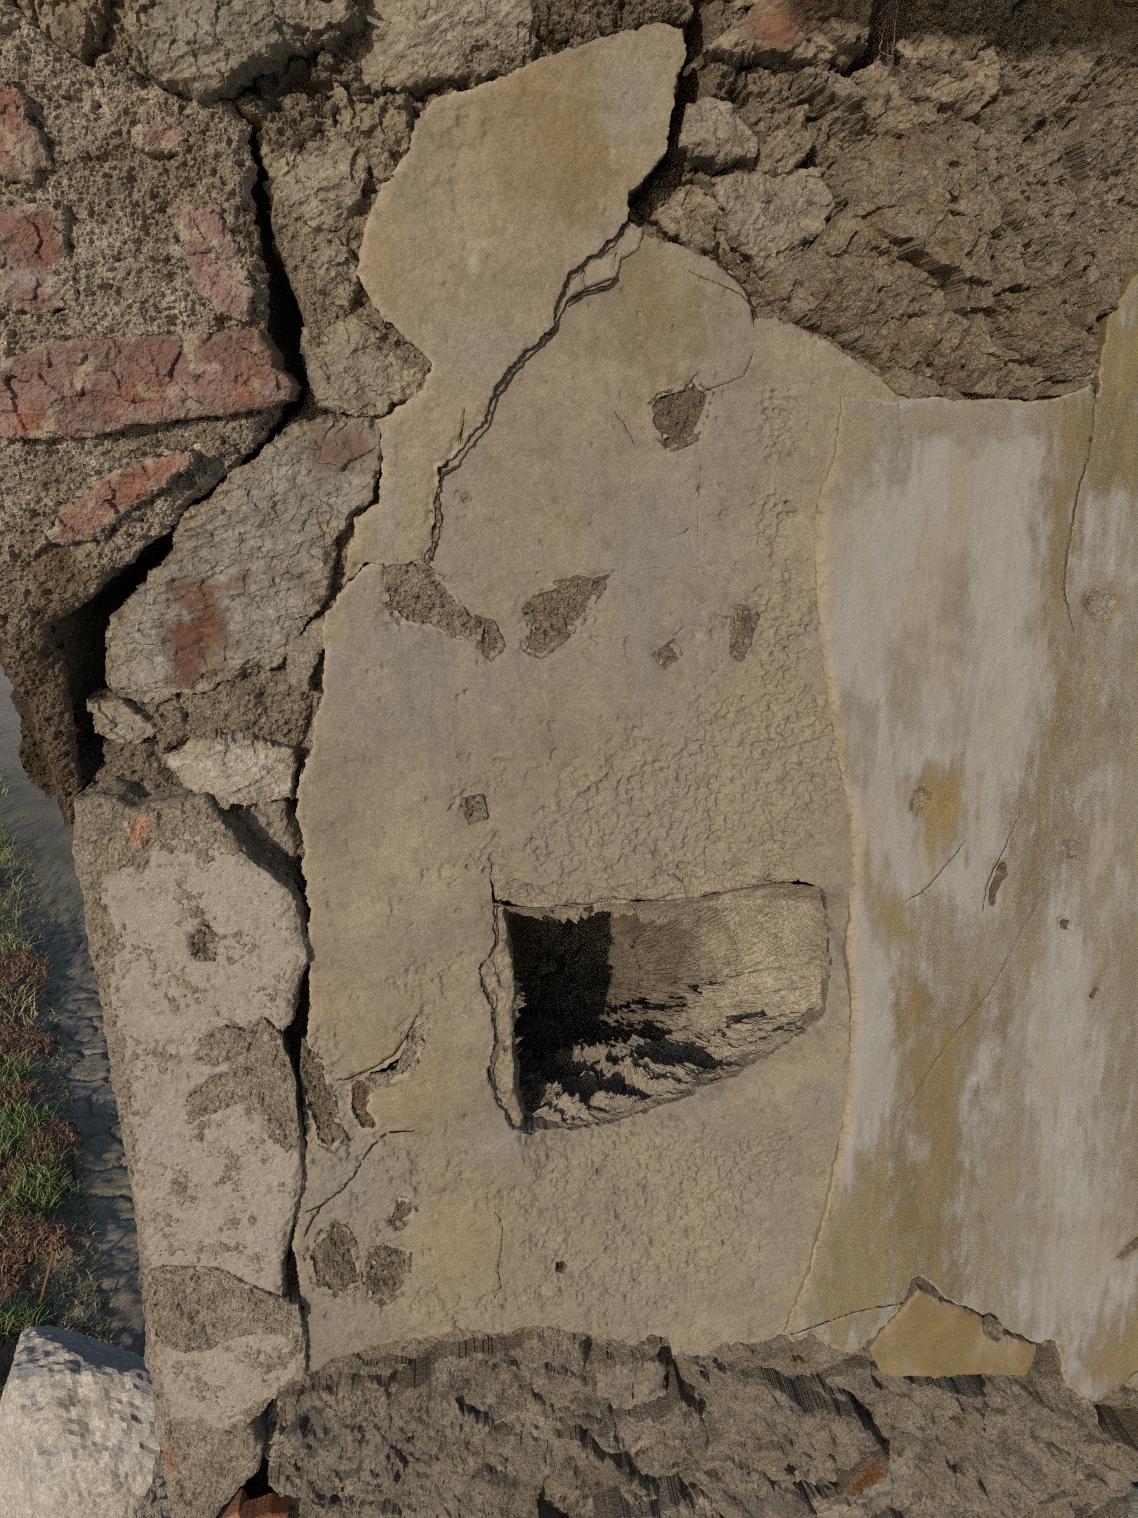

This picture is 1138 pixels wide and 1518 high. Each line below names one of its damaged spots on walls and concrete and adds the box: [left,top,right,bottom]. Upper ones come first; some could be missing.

spalling [895,0,1138,401]
peeling [342,22,687,661]
crack [429,213,632,561]
spalling [647,372,715,452]
crack [1063,385,1097,633]
crack [93,556,151,616]
crack [18,709,56,798]
leakage [807,309,1138,1347]
crack [286,965,417,1094]
crack [286,1130,415,1272]
peeling [866,1276,1060,1379]
leakage [1080,1302,1138,1388]